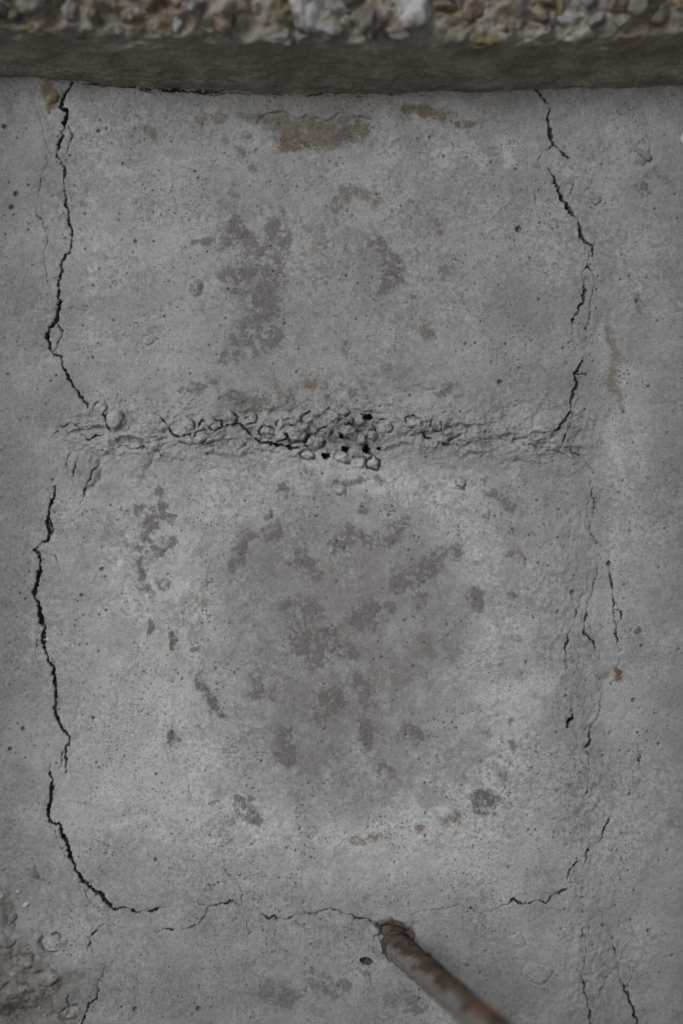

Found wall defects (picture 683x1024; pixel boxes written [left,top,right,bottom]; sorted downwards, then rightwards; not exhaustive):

crack [535,90,594,334]
crack [46,82,309,456]
crack [516,360,586,454]
crack [564,573,622,662]
crack [33,464,232,931]
crack [566,714,591,748]
crack [510,818,609,905]
corrosion [374,918,415,941]
crack [67,988,100,1024]
crack [620,981,638,1024]